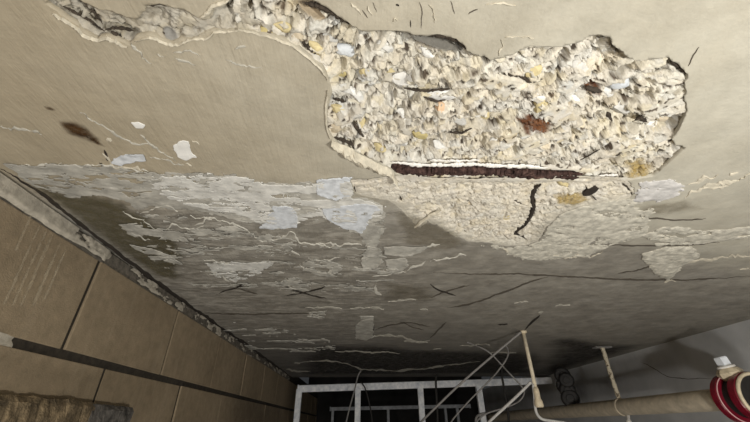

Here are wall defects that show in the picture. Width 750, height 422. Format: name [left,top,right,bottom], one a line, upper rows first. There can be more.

rust [63,123,100,144]
spalling [3,0,750,295]
rust [517,114,550,134]
leakage [41,188,181,277]
crack [514,184,541,239]
crack [1,169,325,381]
leakage [306,298,416,310]
crack [373,266,750,338]
peeling [223,322,335,352]
leakage [286,359,480,372]